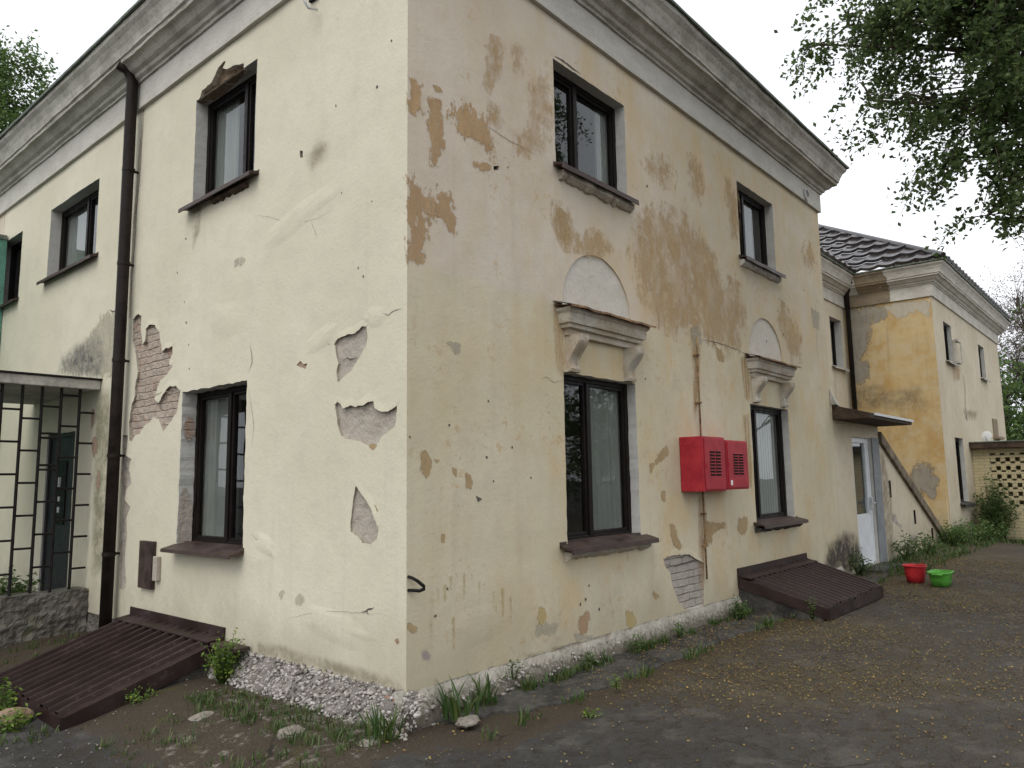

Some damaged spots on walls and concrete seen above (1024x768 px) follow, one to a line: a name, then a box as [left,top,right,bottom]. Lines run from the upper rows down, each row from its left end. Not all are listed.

spalling [197,61,251,104]
peeling [406,77,499,171]
peeling [403,172,457,264]
spalling [333,320,368,381]
spalling [848,300,931,404]
spalling [119,309,195,589]
spalling [332,394,399,450]
spalling [350,479,381,544]
spalling [911,460,940,500]
flaking render [662,524,705,609]
leakage [827,536,860,570]
crack [289,608,381,619]